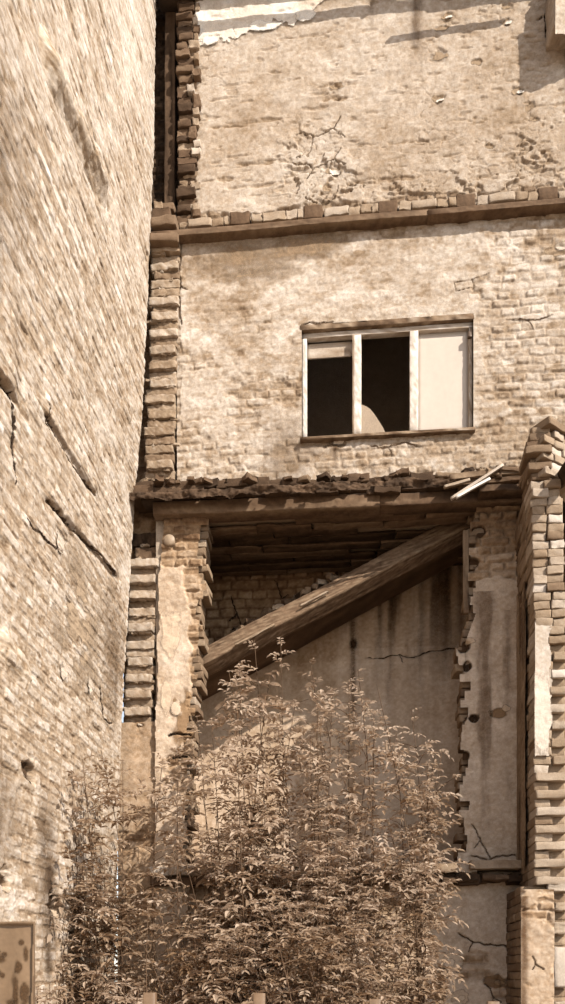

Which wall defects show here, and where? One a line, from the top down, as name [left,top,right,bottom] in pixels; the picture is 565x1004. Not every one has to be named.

flaking render [195,0,323,45]
crack [292,117,345,206]
crack [27,500,116,576]
crack [368,647,458,662]
spalling [458,637,475,672]
leakage [478,595,492,742]
crack [473,825,516,860]
crack [459,934,508,952]